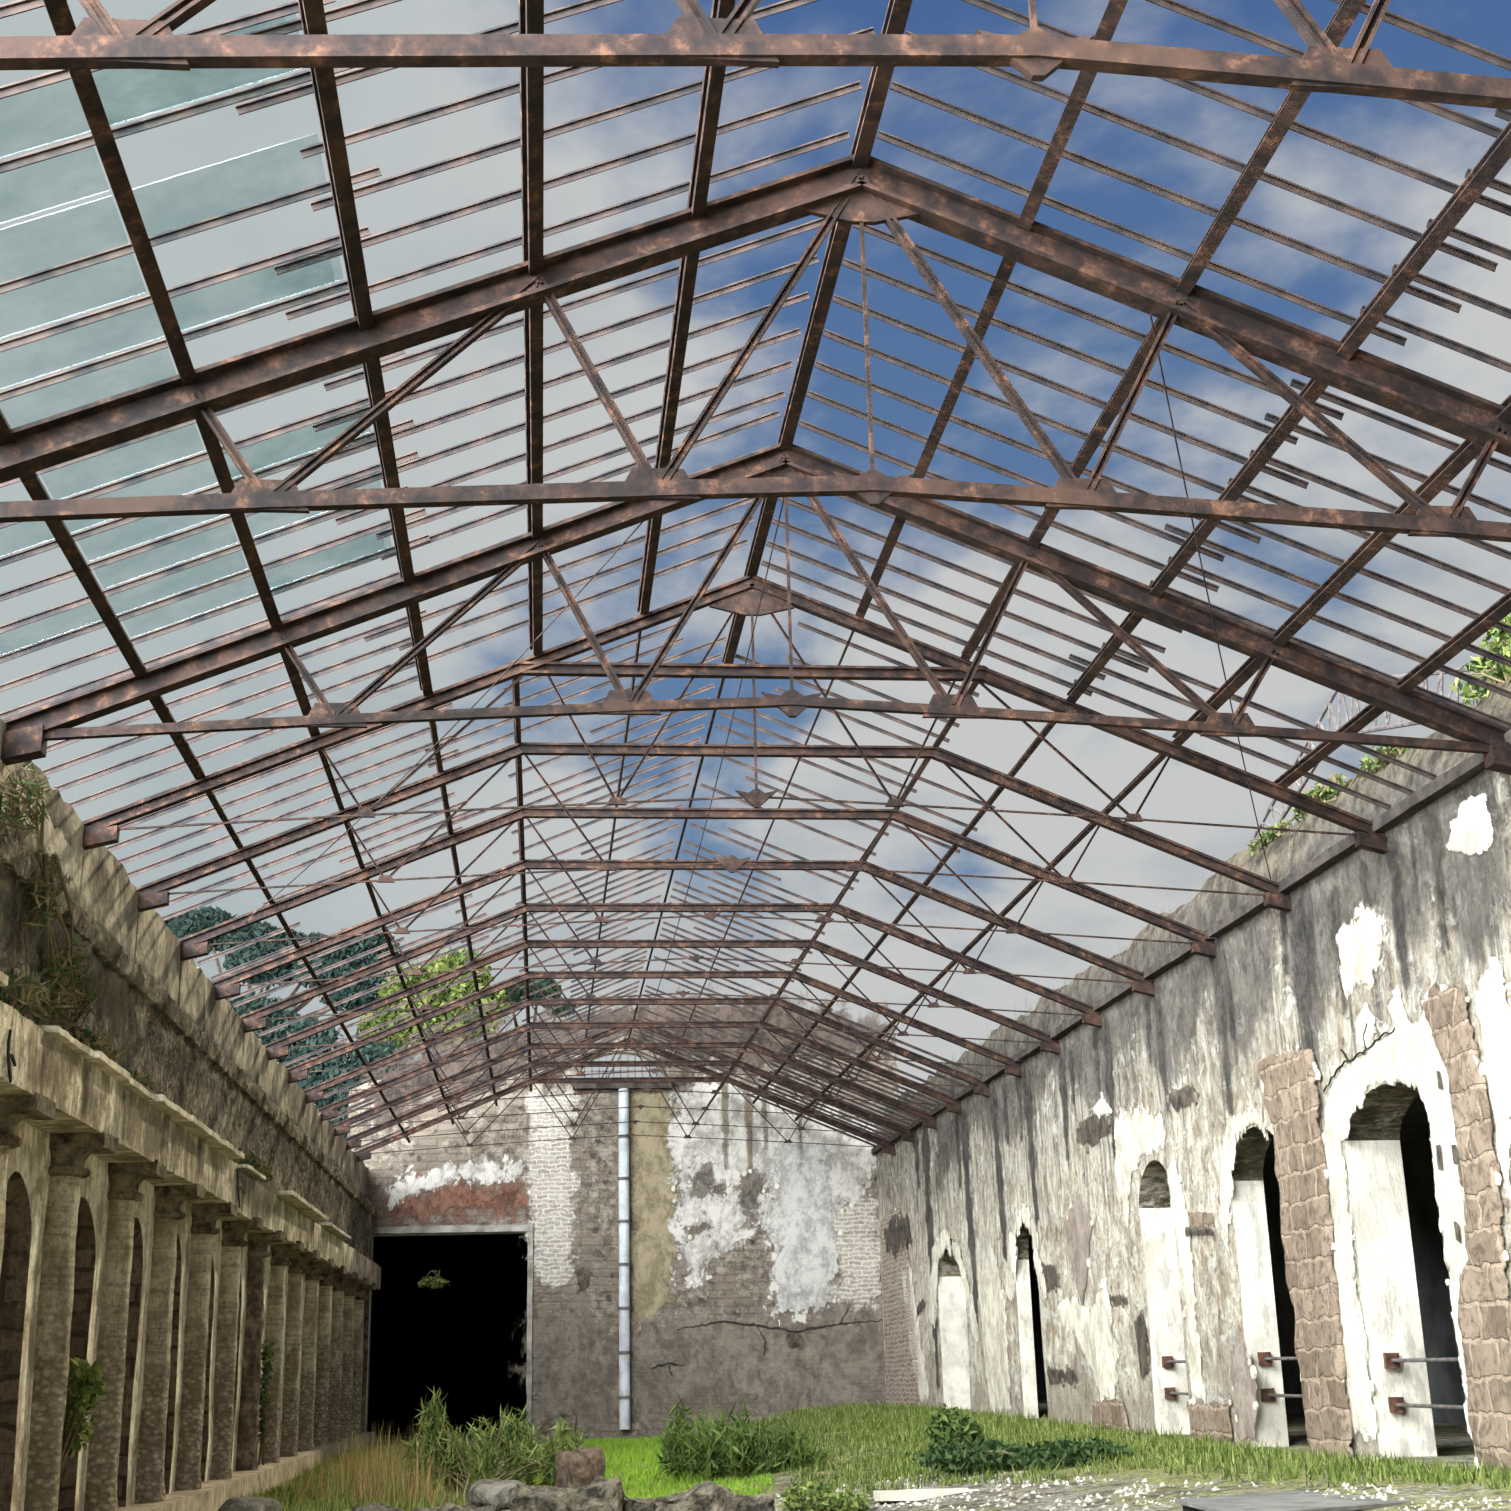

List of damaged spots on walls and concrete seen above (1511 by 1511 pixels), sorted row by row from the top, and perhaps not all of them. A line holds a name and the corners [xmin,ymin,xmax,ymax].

flaking render [518,1085,584,1289]
water stain [913,756,1511,1325]
flaking render [1255,956,1511,1470]